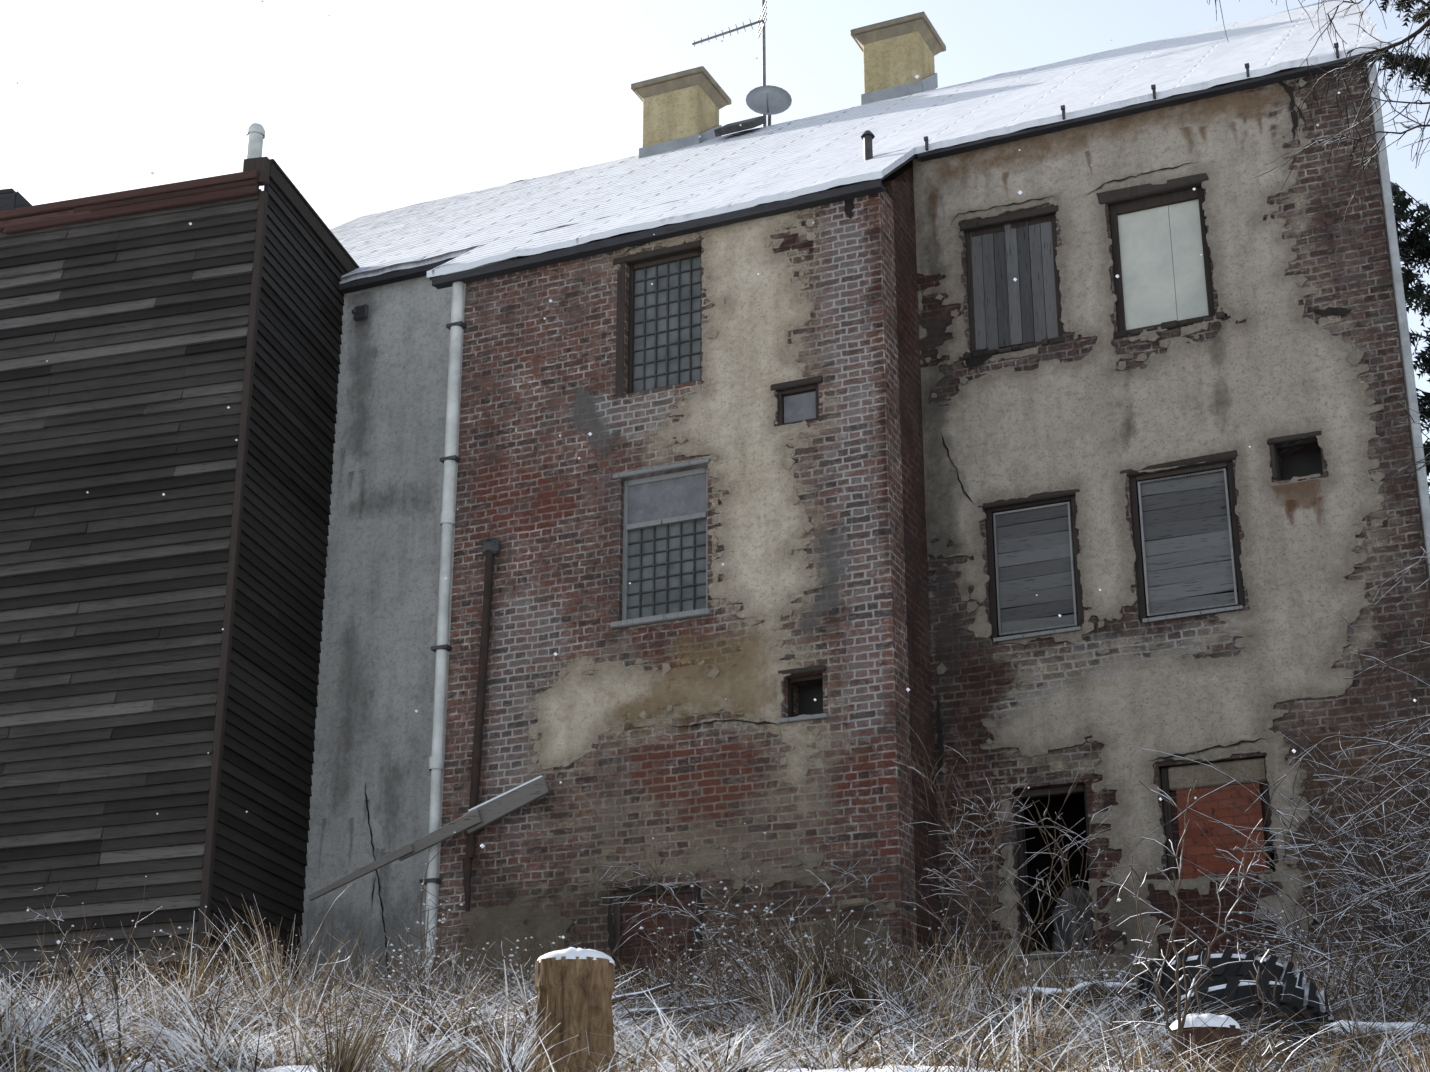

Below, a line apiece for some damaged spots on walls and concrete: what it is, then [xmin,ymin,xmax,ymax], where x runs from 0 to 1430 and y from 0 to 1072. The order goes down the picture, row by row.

spalling [844,199,855,219]
flaking render [917,273,1247,406]
flaking render [527,207,848,817]
crack [940,432,975,505]
flaking render [1143,64,1430,1001]
flaking render [928,538,1244,1004]
flaking render [442,843,835,1008]
flaking render [784,886,901,983]